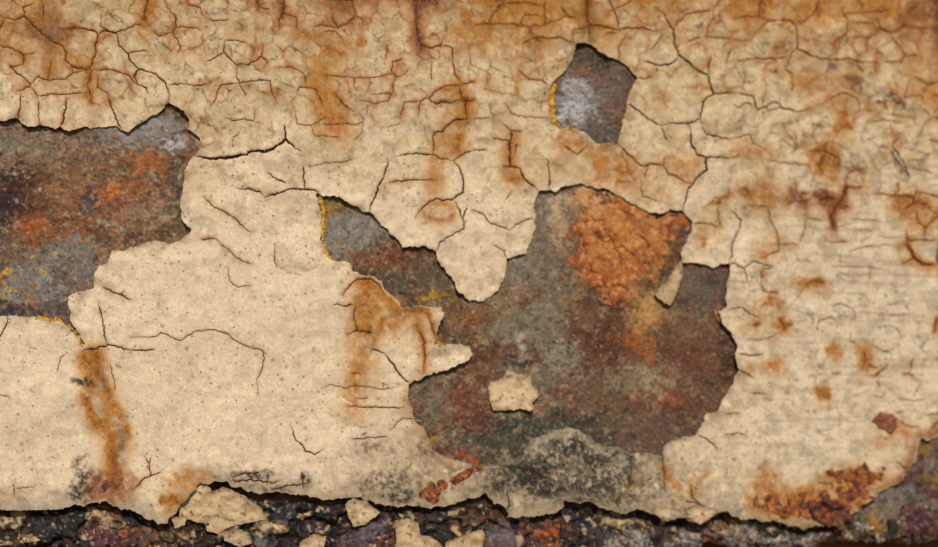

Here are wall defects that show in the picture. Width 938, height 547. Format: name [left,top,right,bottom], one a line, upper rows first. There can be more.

rust [407,0,441,57]
crack [0,0,588,256]
rust [295,31,367,140]
peeling [548,43,637,144]
crack [481,0,938,293]
peeling [0,102,200,346]
crack [201,238,251,287]
rust [353,277,436,387]
peeling [316,183,738,467]
crack [728,307,792,394]
rust [0,342,938,547]
peeling [844,436,938,545]